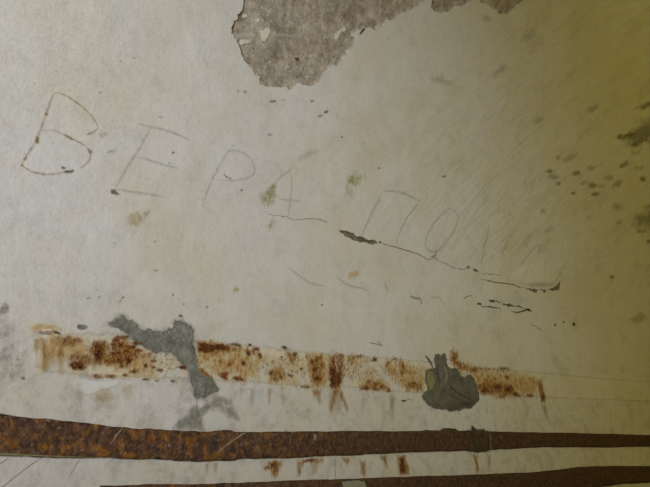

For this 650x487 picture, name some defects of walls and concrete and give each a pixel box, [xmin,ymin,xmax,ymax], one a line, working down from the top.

flaking render [431,0,471,13]
flaking render [480,0,522,14]
flaking render [231,0,424,90]
crack [339,230,425,258]
crack [467,266,560,293]
rust [31,324,163,381]
peeling [108,314,219,399]
rust [197,339,262,382]
rust [300,354,364,409]
peeling [422,353,479,412]
rust [450,348,546,403]
rust [0,414,650,487]